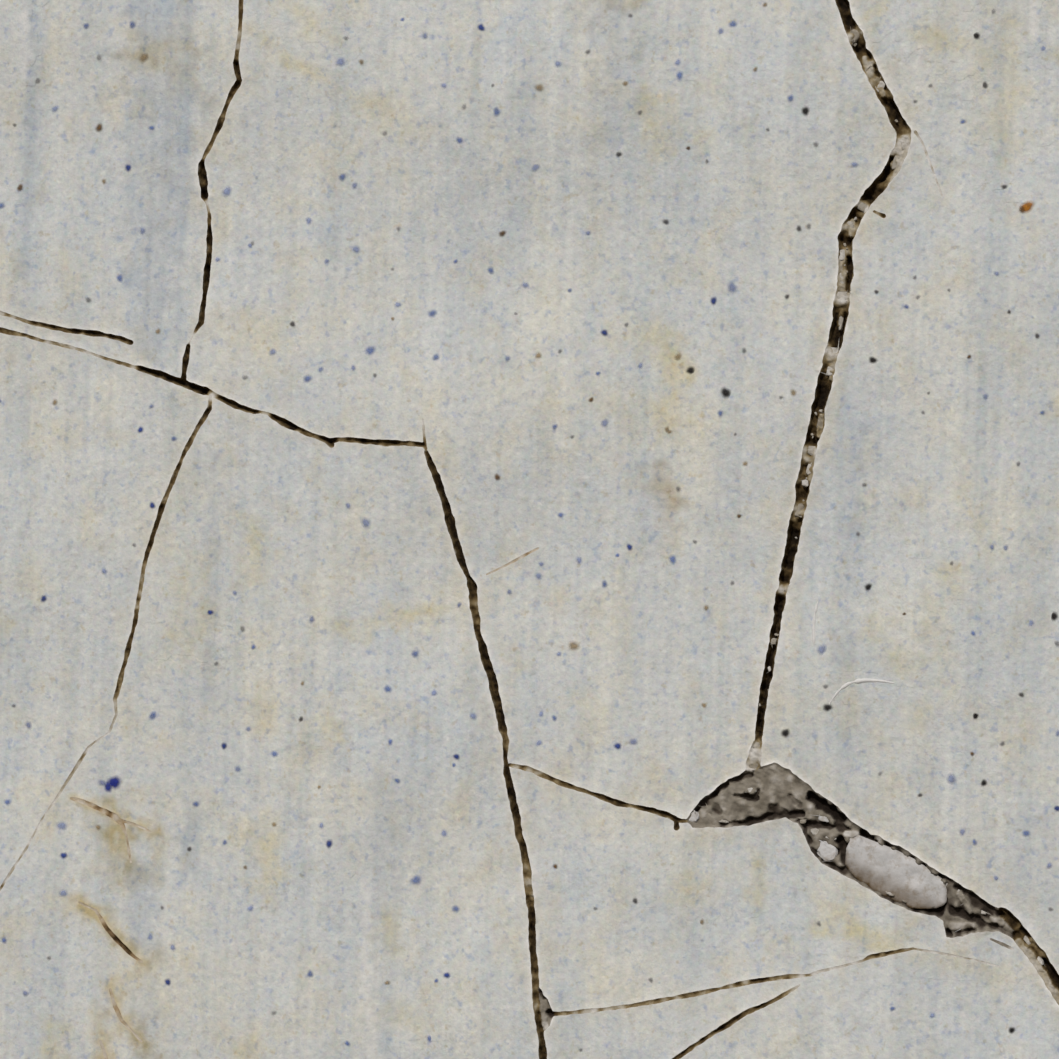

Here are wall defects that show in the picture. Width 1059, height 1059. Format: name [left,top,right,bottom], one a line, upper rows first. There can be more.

crack [0,0,427,891]
crack [746,0,943,773]
crack [424,450,999,1059]
crack [78,902,143,963]
crack [109,988,143,1043]
spalling [686,763,1015,950]
crack [998,907,1059,1005]